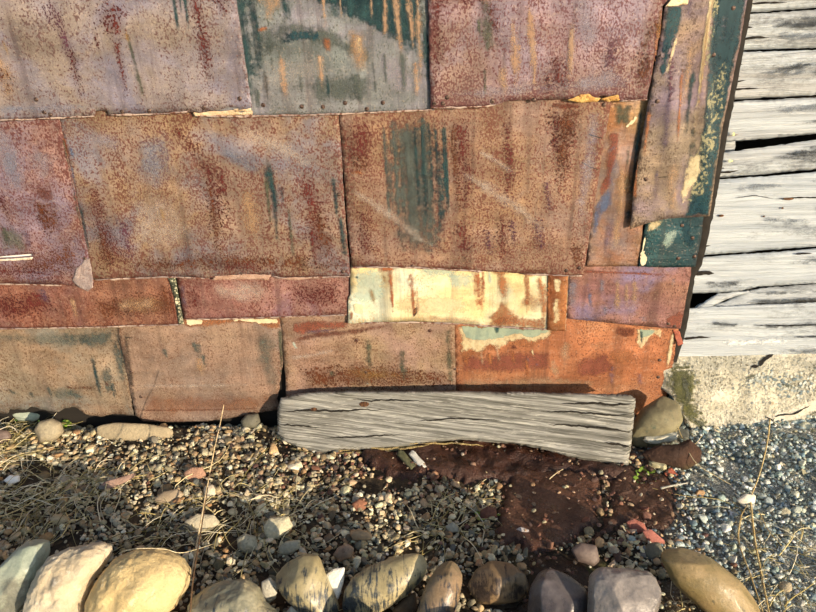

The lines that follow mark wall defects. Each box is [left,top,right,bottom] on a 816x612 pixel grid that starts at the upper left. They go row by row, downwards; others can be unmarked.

rust [42,0,84,96]
rust [89,1,129,93]
rust [192,0,229,88]
rust [383,0,422,67]
rust [0,237,80,278]
rust [34,190,63,236]
rust [86,128,340,274]
rust [448,119,488,263]
rust [474,272,485,305]
rust [483,213,560,328]
rust [543,104,580,209]
rust [463,346,569,385]